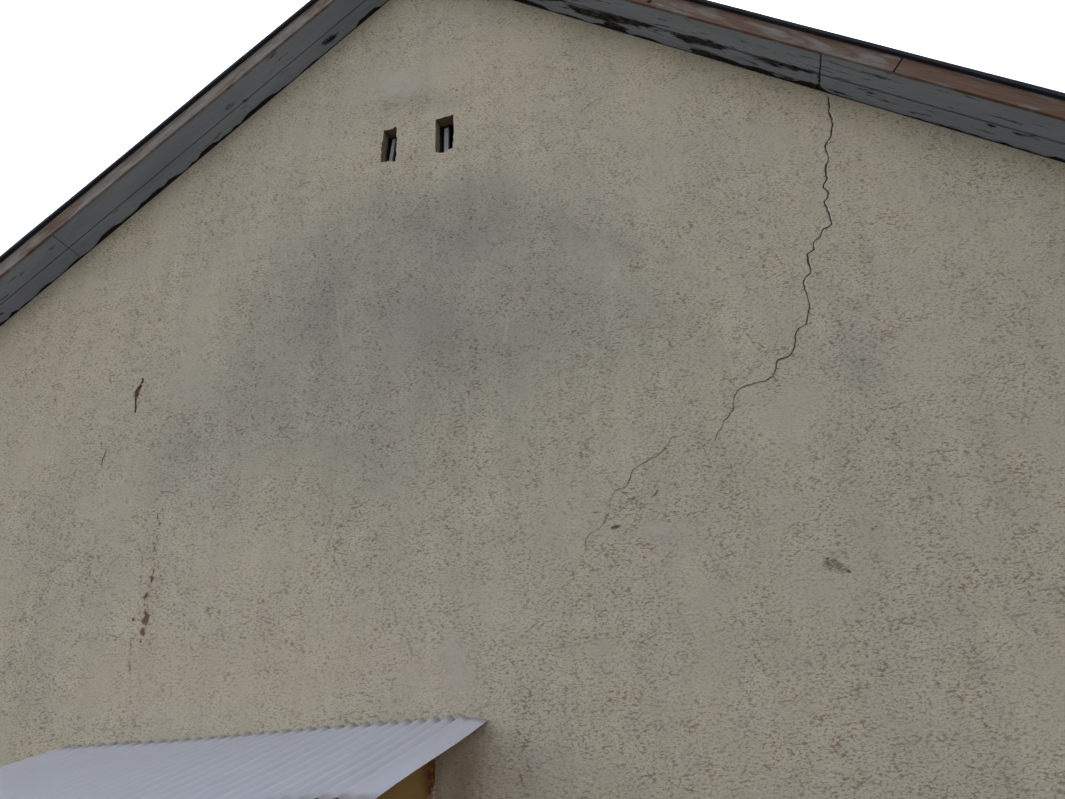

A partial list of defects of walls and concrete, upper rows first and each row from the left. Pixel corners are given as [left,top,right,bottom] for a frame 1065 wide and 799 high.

peeling [0,0,389,326]
peeling [513,0,1065,163]
crack [715,96,834,439]
crack [585,437,672,552]
corrosion [130,569,154,646]